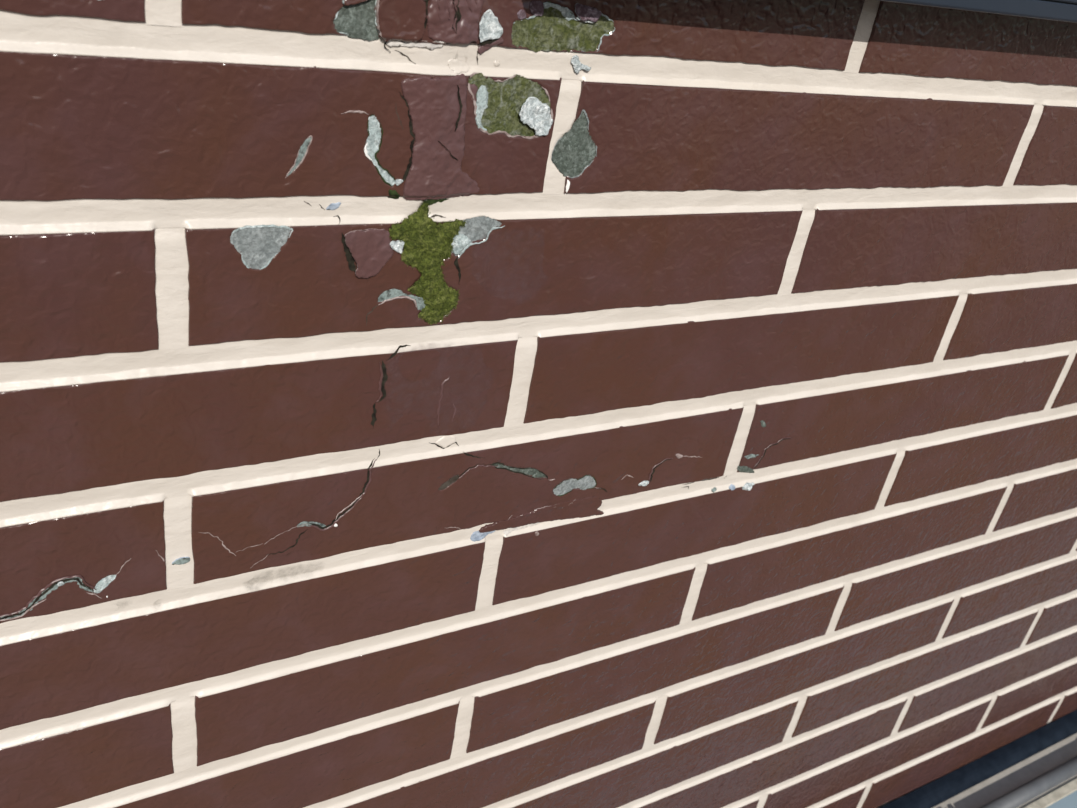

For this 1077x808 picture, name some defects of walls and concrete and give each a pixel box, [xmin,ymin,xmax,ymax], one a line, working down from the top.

peeling [333,0,447,50]
peeling [478,0,615,74]
peeling [341,110,403,199]
peeling [468,73,597,194]
peeling [230,224,293,270]
peeling [304,201,404,278]
peeling [451,216,504,257]
peeling [366,289,425,326]
crack [198,345,411,568]
crack [431,436,554,490]
peeling [553,475,598,496]
crack [0,558,131,621]